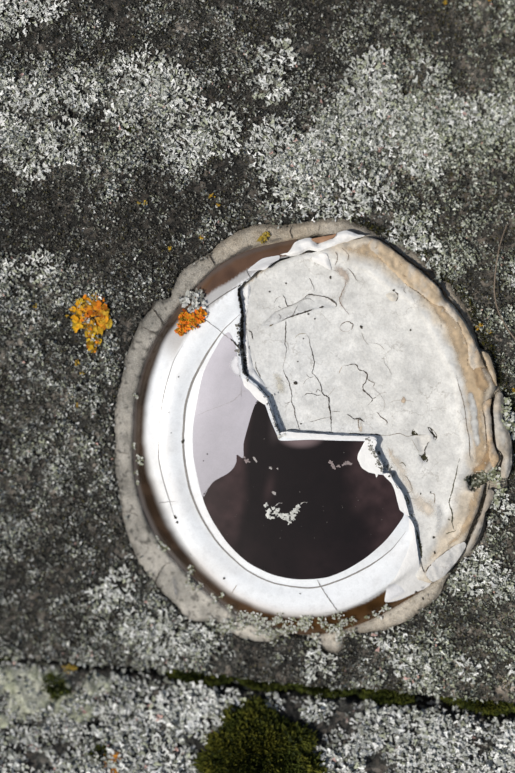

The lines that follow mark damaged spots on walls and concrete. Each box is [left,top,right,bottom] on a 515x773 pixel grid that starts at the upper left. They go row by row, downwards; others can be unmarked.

peeling [248,255,280,271]
spalling [261,291,337,326]
peeling [368,239,497,386]
peeling [230,356,273,405]
crack [201,248,487,583]
spalling [411,427,437,462]
peeling [483,398,499,468]
peeling [264,491,307,525]
peeling [328,439,466,602]